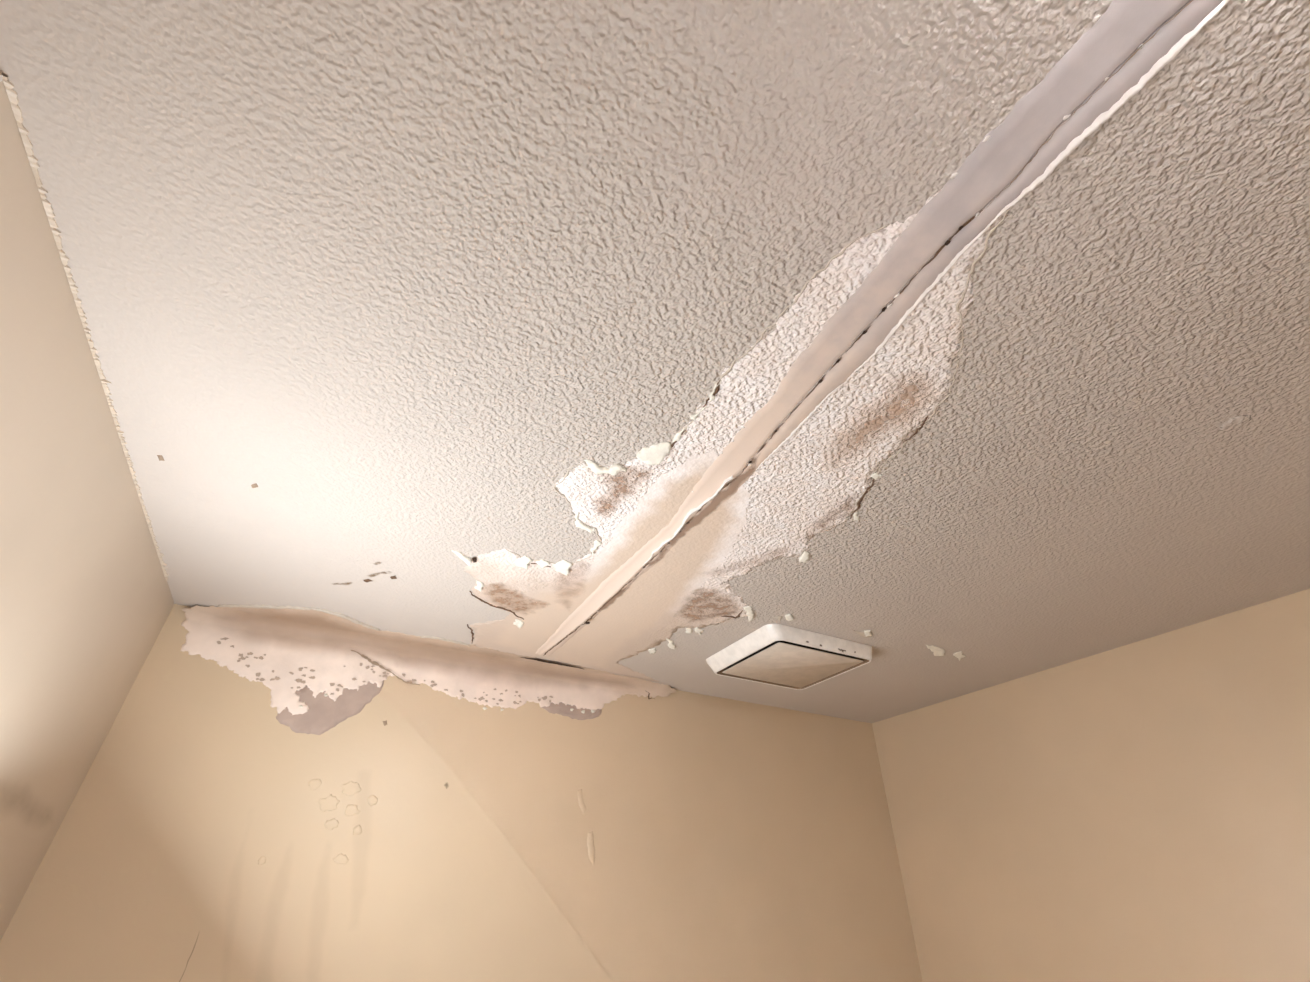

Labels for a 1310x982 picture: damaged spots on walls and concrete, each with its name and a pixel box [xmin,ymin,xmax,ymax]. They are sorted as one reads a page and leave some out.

peeling [180,189,1023,735]
leakage [684,592,730,620]
crack [543,0,1193,656]